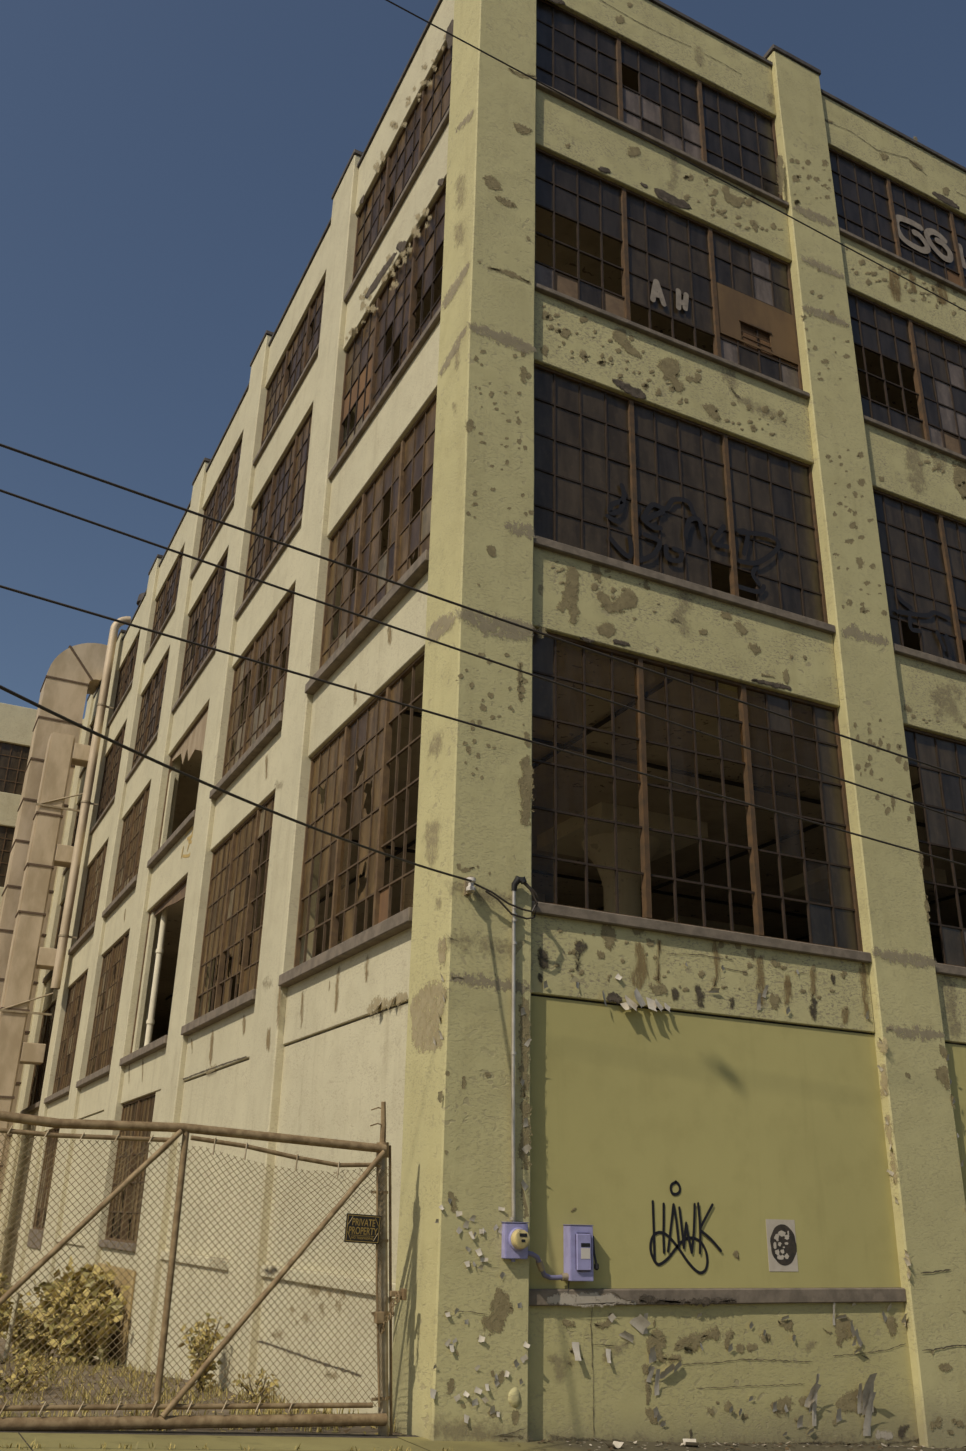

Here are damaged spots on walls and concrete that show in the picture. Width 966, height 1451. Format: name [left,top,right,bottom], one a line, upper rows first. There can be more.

peeling [482,175,517,208]
peeling [640,174,783,232]
peeling [776,154,831,205]
spalling [345,207,432,341]
peeling [465,305,787,470]
peeling [551,561,660,646]
peeling [456,653,534,826]
peeling [544,924,847,1014]
peeling [435,997,533,1356]
peeling [430,1341,530,1425]
peeling [594,1294,796,1427]
peeling [770,1373,877,1436]